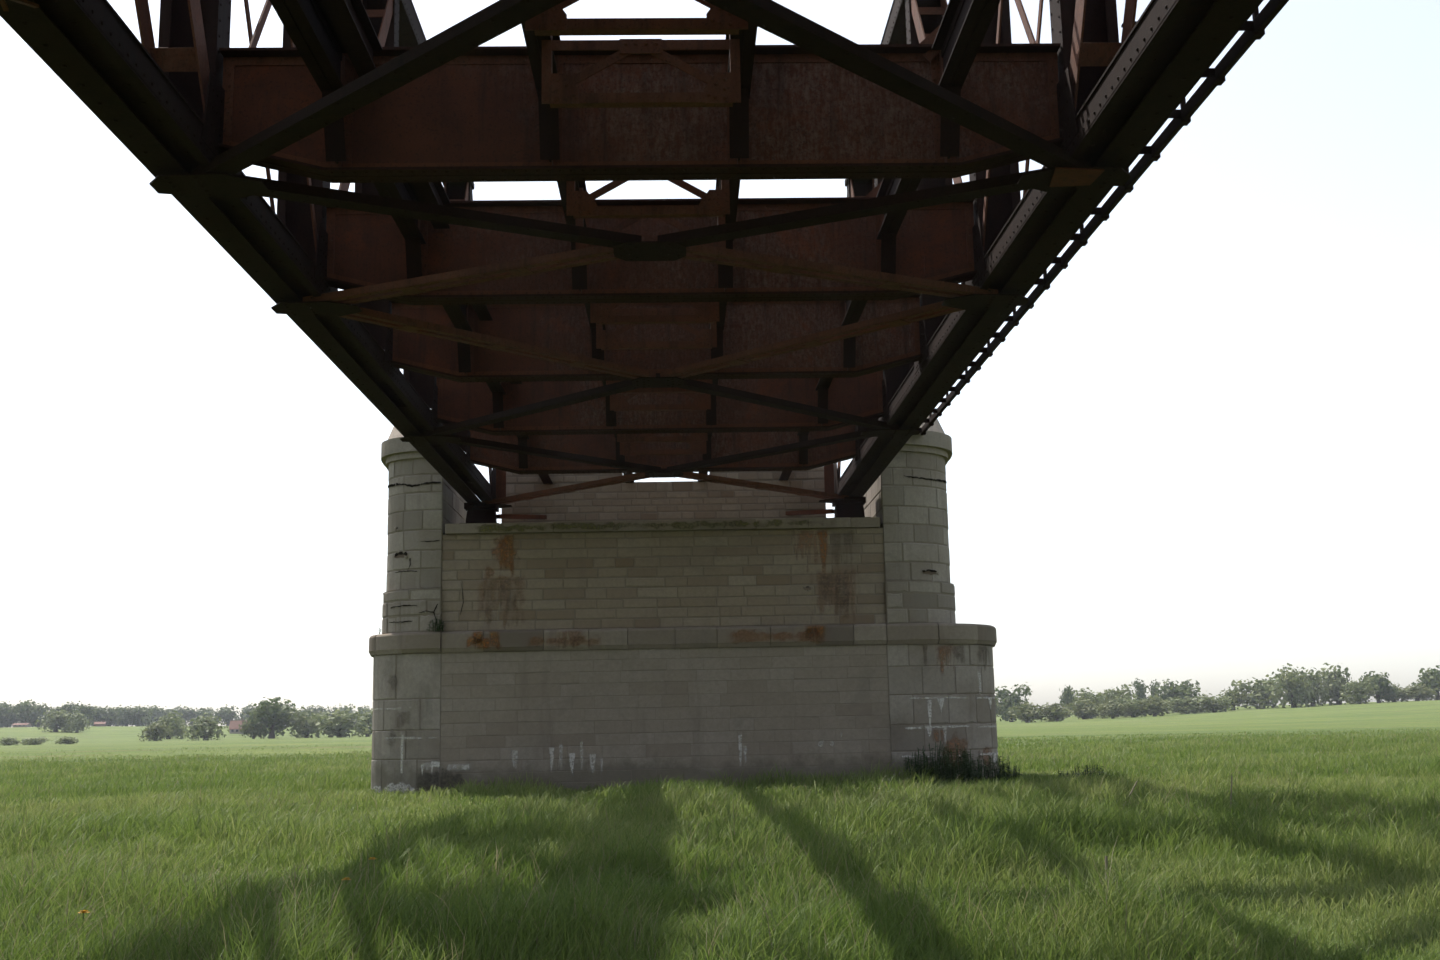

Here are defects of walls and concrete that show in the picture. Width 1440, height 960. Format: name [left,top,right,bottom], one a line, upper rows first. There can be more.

crack [388,481,441,489]